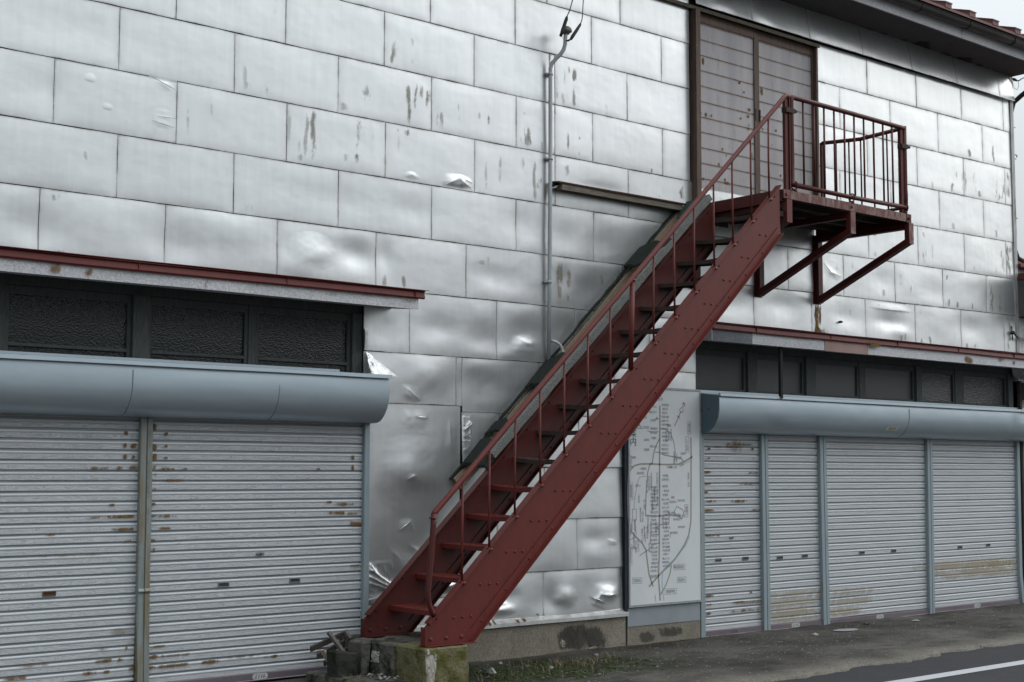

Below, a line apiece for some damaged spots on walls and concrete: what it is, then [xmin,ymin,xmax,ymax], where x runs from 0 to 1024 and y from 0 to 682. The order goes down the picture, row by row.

rust [814,305,826,333]
peeling [364,328,396,376]
rust [91,431,137,470]
rust [153,424,187,482]
rust [704,443,754,511]
rust [91,504,134,542]
rust [327,501,362,526]
water stain [558,624,605,650]